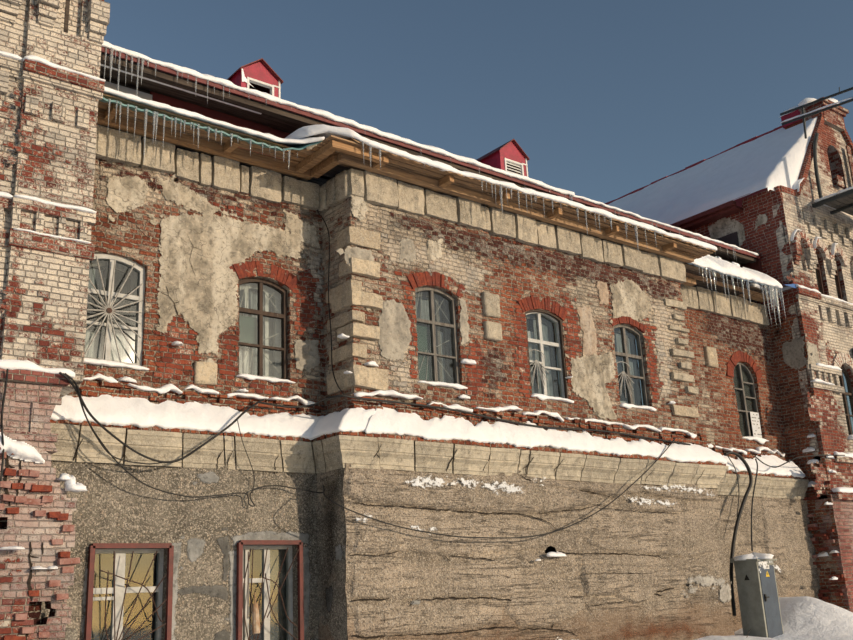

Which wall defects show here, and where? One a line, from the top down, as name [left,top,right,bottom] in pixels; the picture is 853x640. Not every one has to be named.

spalling [0,89,71,193]
peeling [708,214,770,246]
spalling [0,278,84,369]
peeling [67,157,326,417]
spalling [366,212,680,409]
spalling [347,288,794,463]
crack [348,490,679,530]
spalling [811,461,853,497]
spalling [0,557,22,588]
crack [350,550,408,558]
crack [351,597,577,639]
crack [559,541,674,619]